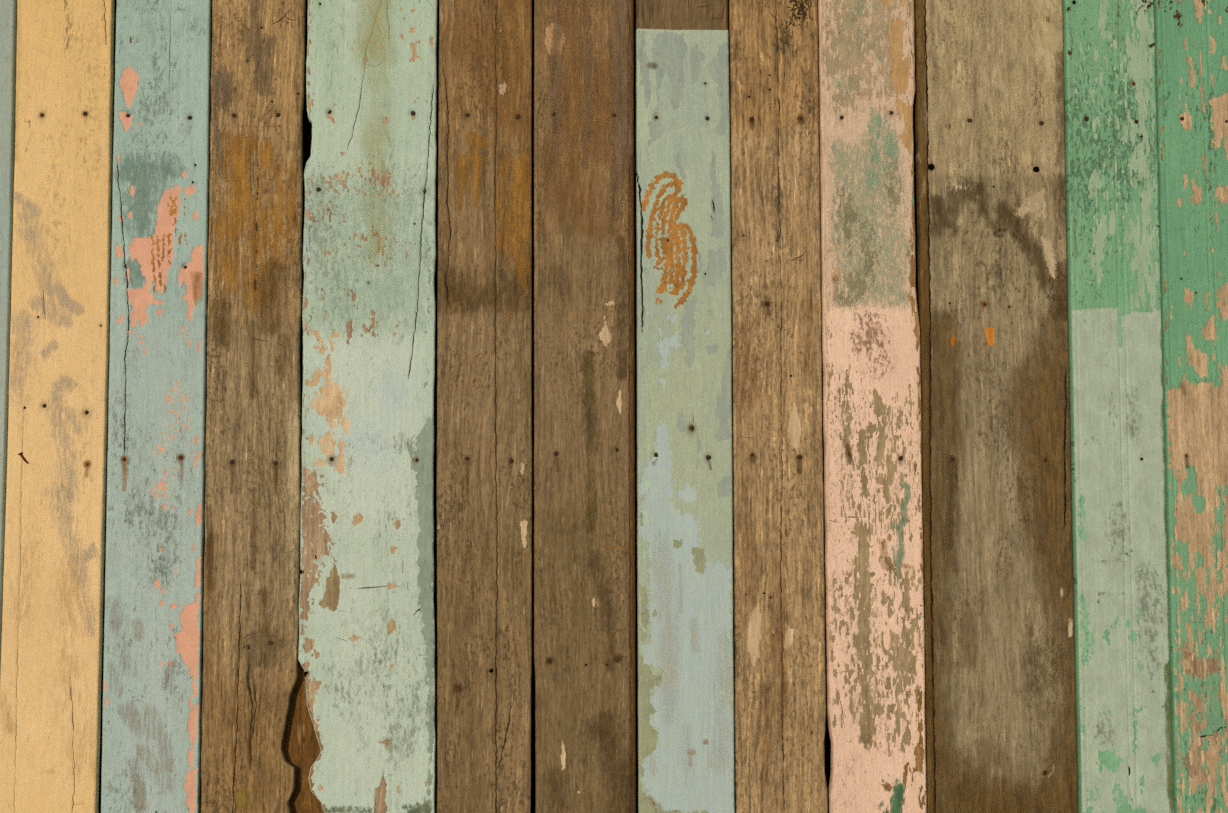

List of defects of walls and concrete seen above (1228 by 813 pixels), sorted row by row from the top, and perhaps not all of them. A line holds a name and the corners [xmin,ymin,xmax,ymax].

peeling [119,66,142,133]
peeling [307,0,336,123]
peeling [398,3,434,62]
peeling [113,169,205,355]
peeling [147,380,202,525]
peeling [299,151,440,813]
peeling [520,519,528,548]
peeling [821,0,926,810]
peeling [1072,0,1228,813]
peeling [154,544,201,813]